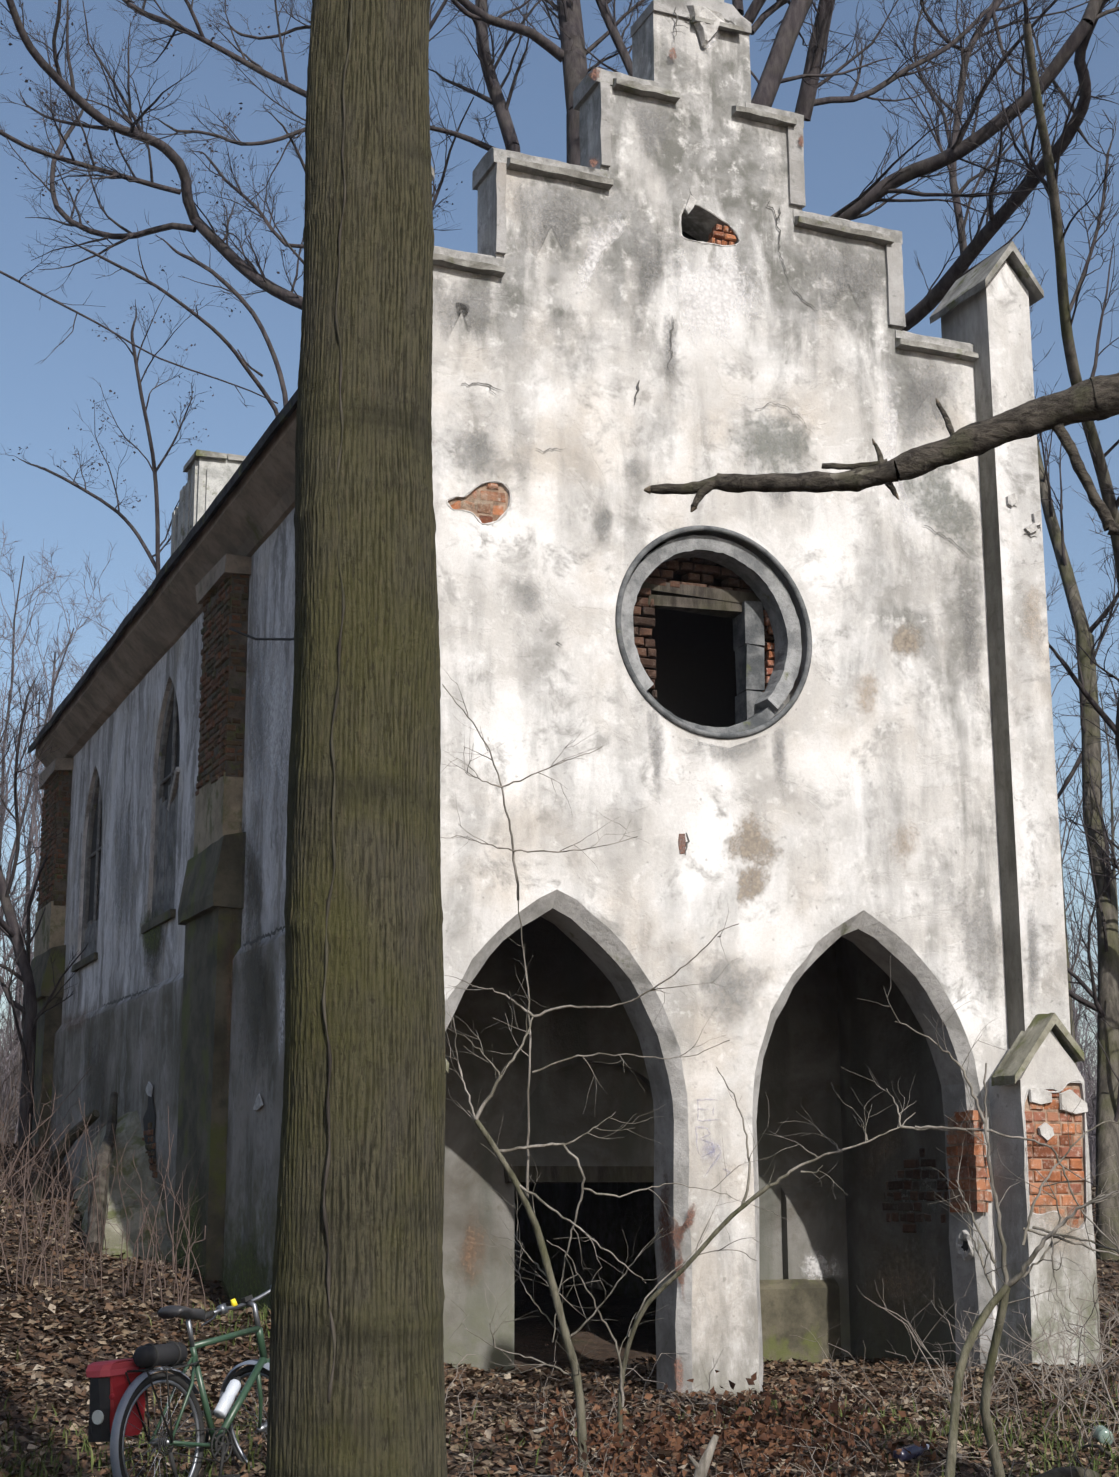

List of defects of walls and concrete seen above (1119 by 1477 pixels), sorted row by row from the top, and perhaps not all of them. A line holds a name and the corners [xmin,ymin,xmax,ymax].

spalling [679,195,741,247]
spalling [446,480,512,525]
flaking render [678,833,690,855]
water stain [730,815,774,900]
flaking render [1028,1088,1088,1115]
flaking render [142,1122,158,1178]
flaking render [1038,1123,1054,1141]